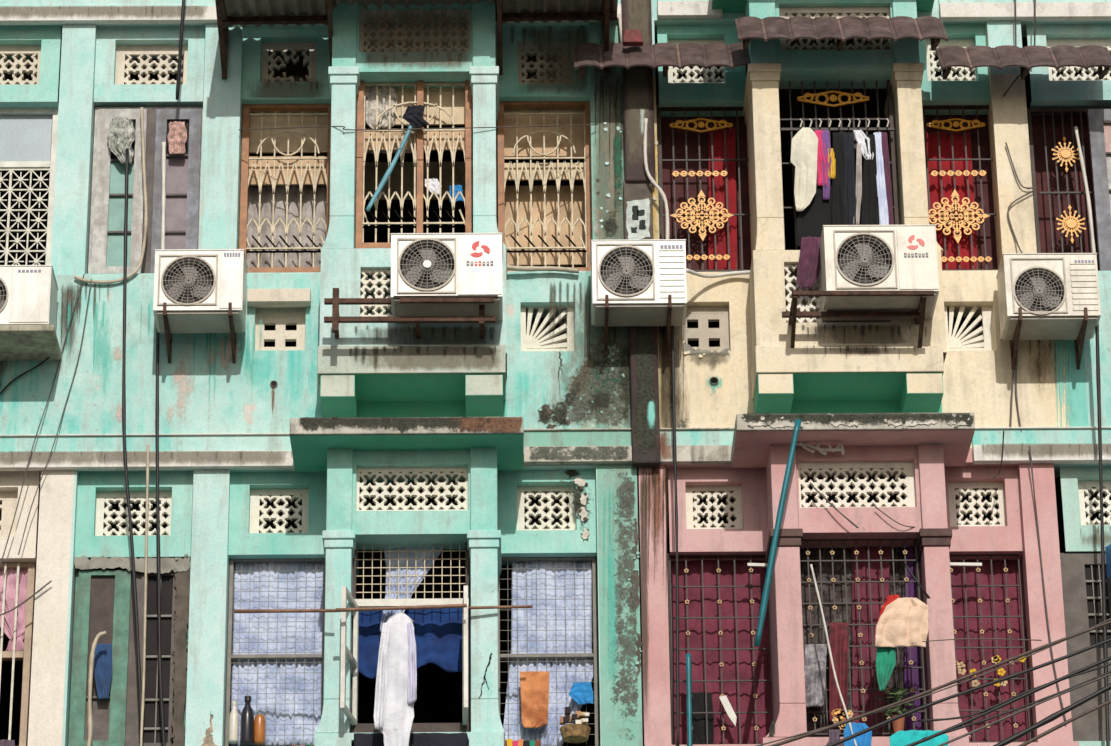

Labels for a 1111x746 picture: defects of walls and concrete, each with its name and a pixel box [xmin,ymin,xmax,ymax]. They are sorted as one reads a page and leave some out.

peeling [574,476,590,542]
leakage [530,283,689,739]
peeling [74,553,191,746]
peeling [201,712,218,746]